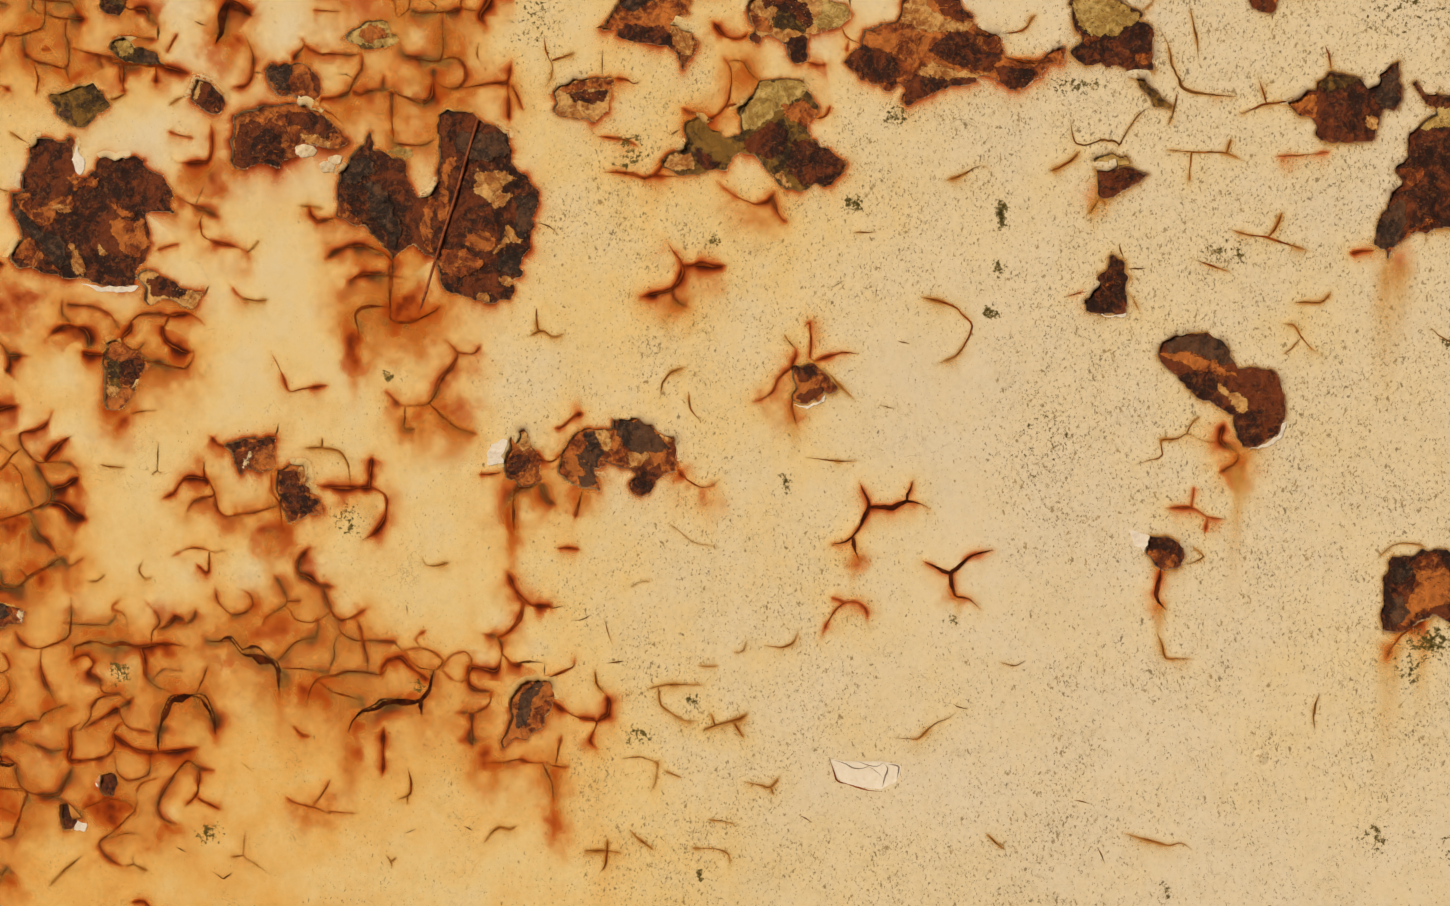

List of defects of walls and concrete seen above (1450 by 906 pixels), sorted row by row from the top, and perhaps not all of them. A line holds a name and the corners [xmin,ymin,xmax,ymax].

peeling [2,74,206,315]
peeling [184,60,542,310]
crack [599,20,759,182]
peeling [658,0,1173,200]
peeling [1280,56,1450,258]
rust [0,280,45,335]
rust [341,281,447,377]
crack [639,247,726,313]
rust [250,517,296,556]
crack [0,0,679,906]
crack [808,457,929,561]
rust [81,780,135,835]